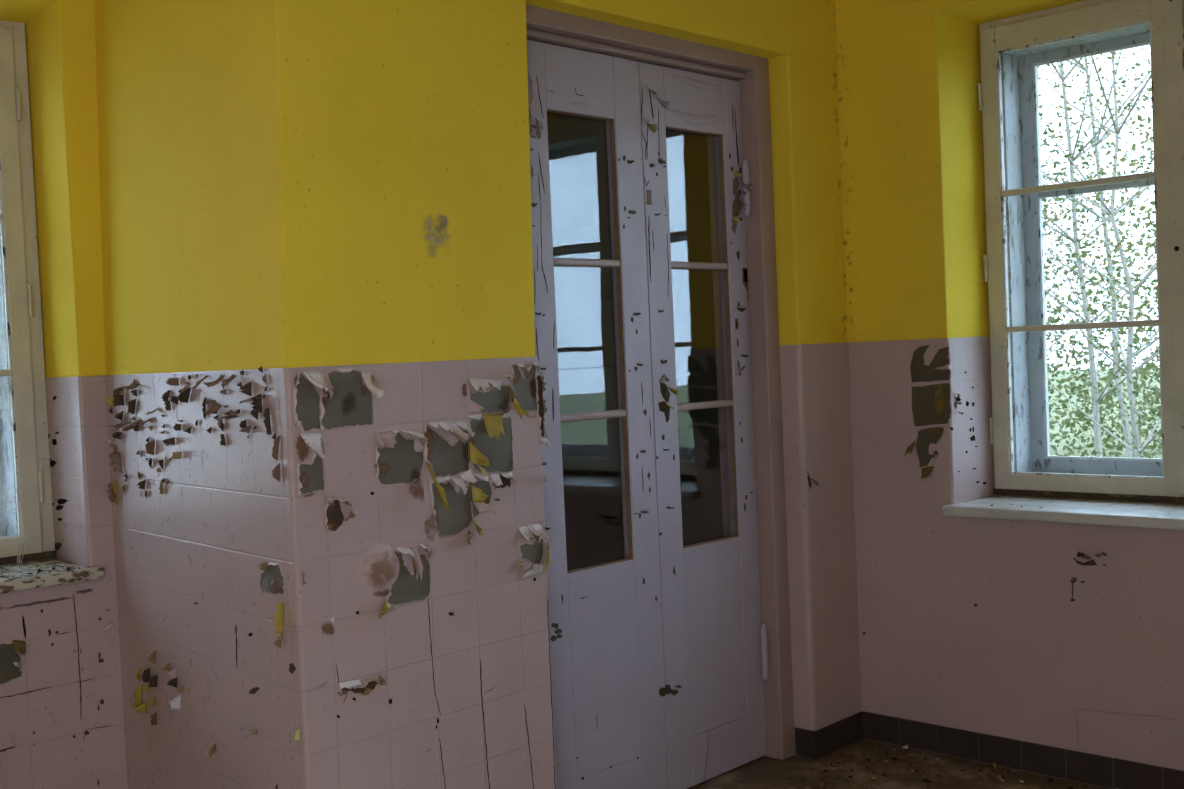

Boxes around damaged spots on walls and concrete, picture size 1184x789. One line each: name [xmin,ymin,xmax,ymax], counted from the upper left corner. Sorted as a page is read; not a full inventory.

peeling [105,366,281,506]
peeling [293,362,551,619]
peeling [904,344,978,479]
peeling [0,639,31,686]
crack [20,615,28,639]
crack [57,596,112,730]
peeling [130,650,184,726]
peeling [258,561,286,648]
peeling [336,664,387,702]
crack [426,603,446,789]
crack [480,660,495,789]
crack [524,595,589,789]